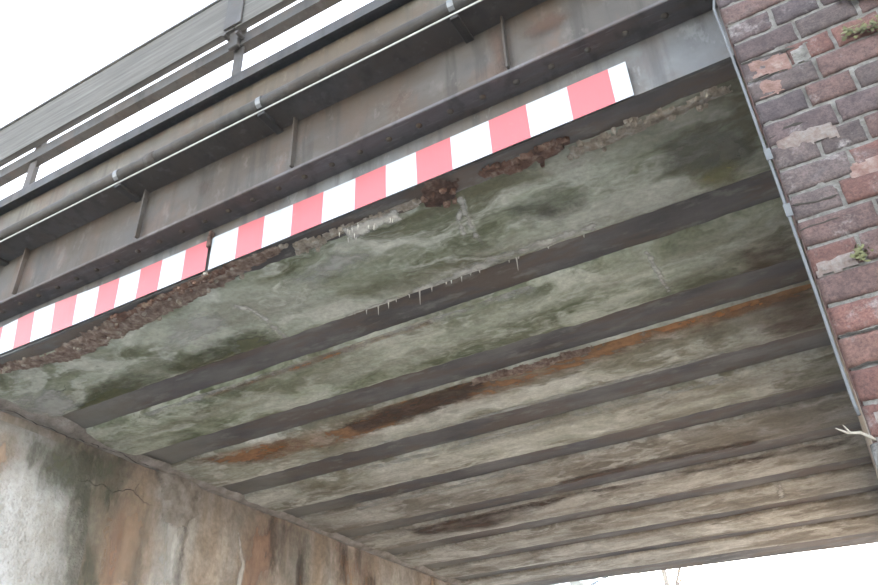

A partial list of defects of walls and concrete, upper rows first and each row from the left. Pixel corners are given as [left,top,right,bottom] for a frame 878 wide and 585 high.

spalling [776,122,840,149]
spalling [850,155,878,178]
water stain [339,210,401,242]
water stain [457,197,477,237]
water stain [508,224,595,268]
spalling [0,178,459,374]
water stain [349,263,492,316]
corrosion [208,284,824,463]
crack [7,386,149,514]
water stain [29,443,123,585]
water stain [167,523,179,579]